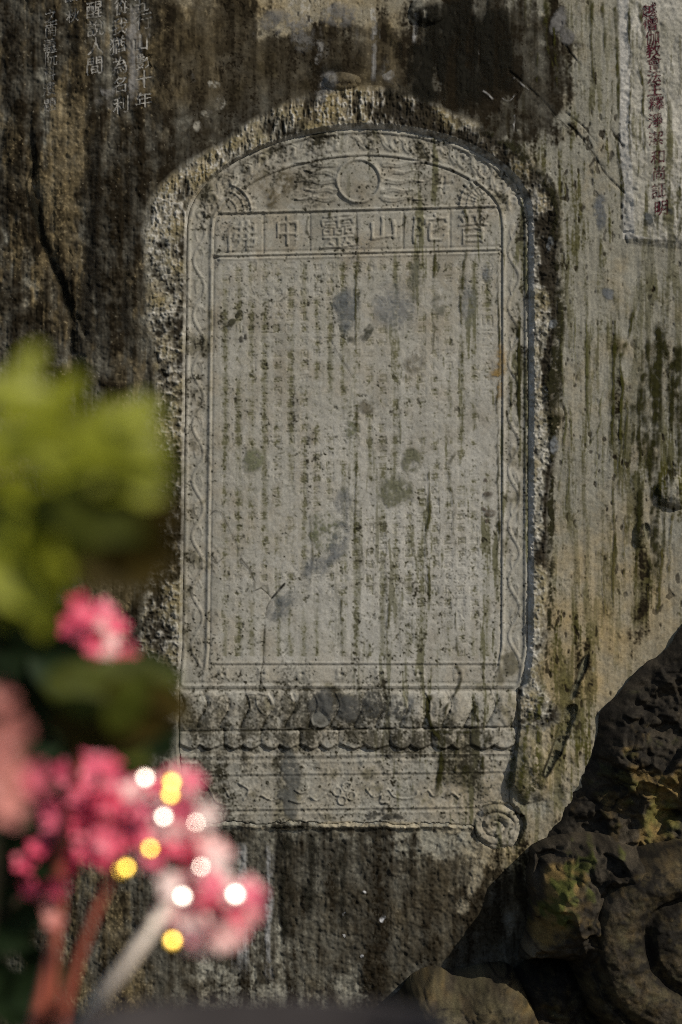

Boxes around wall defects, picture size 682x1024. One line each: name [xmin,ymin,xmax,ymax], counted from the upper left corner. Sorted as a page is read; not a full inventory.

leakage [66,15,79,100]
leakage [386,0,537,105]
leakage [590,3,646,196]
leakage [83,132,102,330]
leakage [539,261,682,610]
leakage [545,475,569,663]
leakage [262,824,319,960]